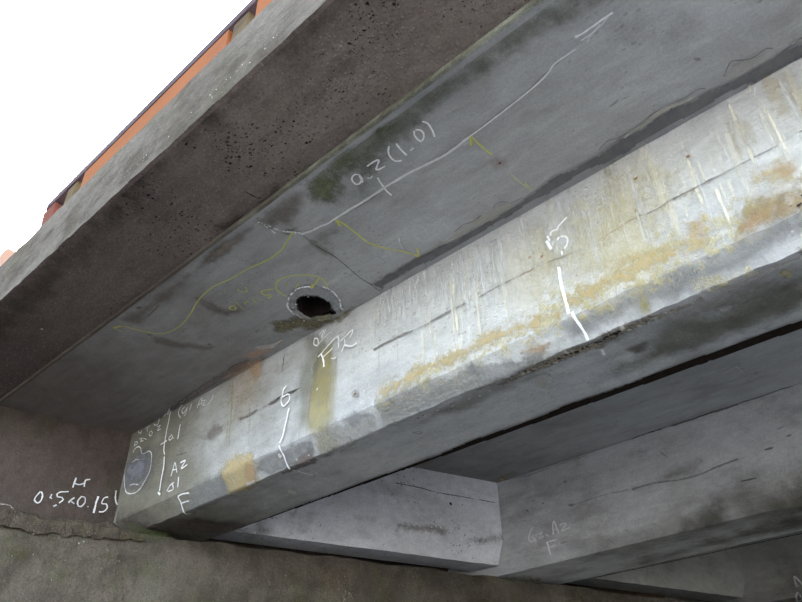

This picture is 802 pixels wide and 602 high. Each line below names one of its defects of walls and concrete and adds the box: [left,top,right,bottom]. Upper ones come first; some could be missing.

crack [223,217,242,229]
water stain [264,196,300,226]
crack [297,186,389,291]
spalling [316,249,802,456]
water stain [652,277,802,356]
water stain [116,320,802,535]
corrosion [221,453,258,496]